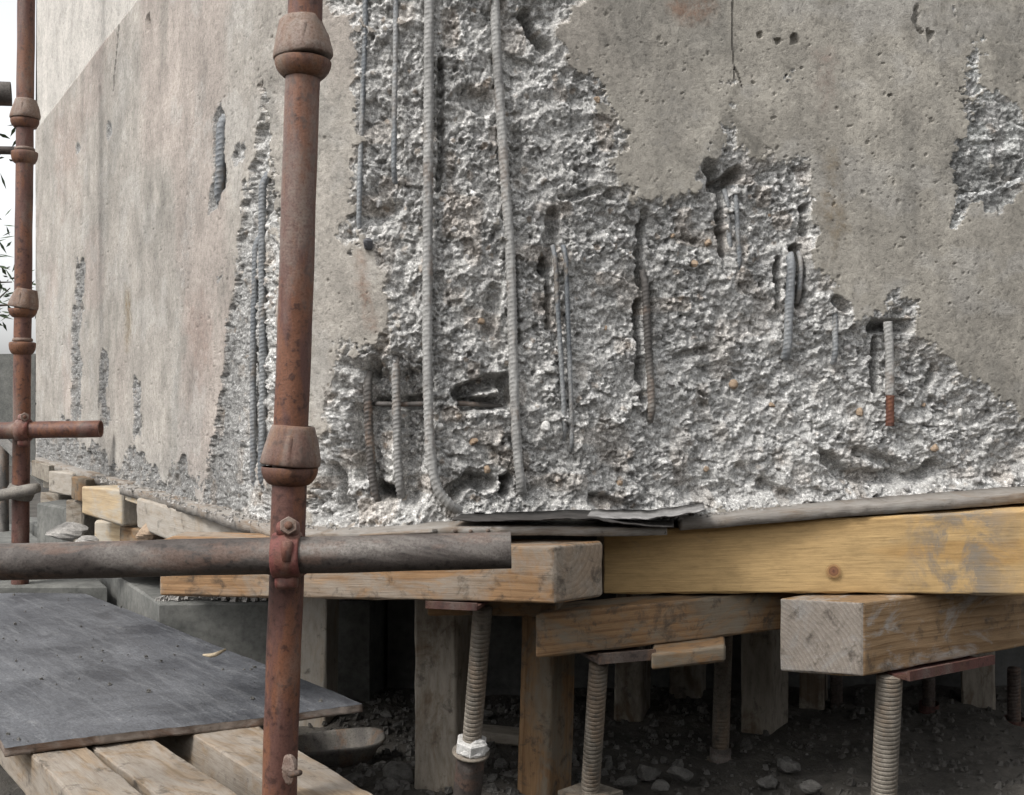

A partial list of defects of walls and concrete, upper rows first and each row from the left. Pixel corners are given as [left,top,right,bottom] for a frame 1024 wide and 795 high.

spalling [36,75,281,520]
spalling [306,0,1024,528]
crack [731,0,743,88]